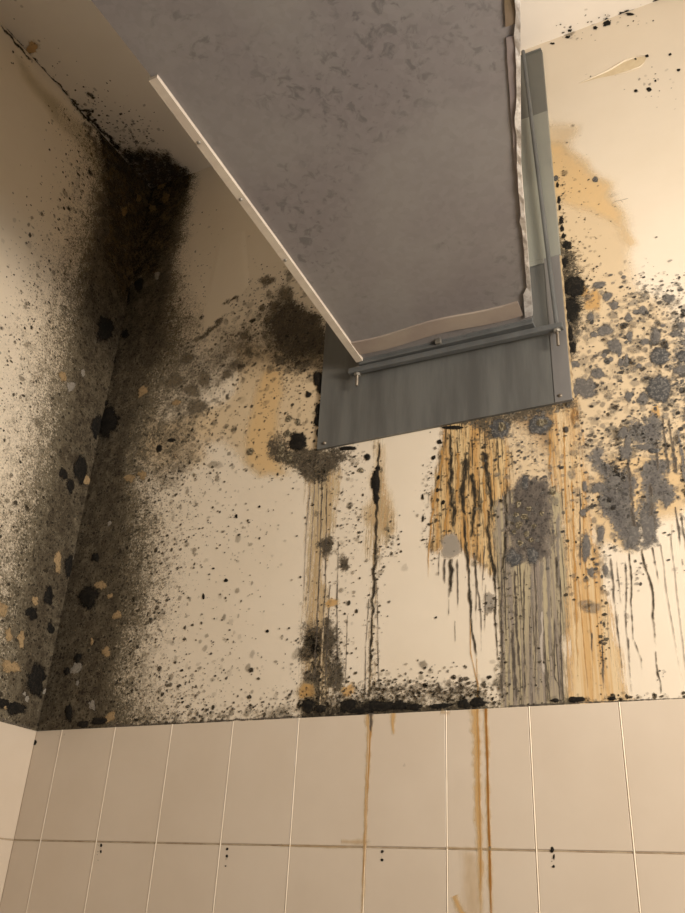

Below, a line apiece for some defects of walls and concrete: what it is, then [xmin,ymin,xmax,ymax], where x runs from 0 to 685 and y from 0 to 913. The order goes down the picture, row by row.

damp [0,27,685,731]
corrosion [362,713,373,895]
corrosion [471,709,492,912]